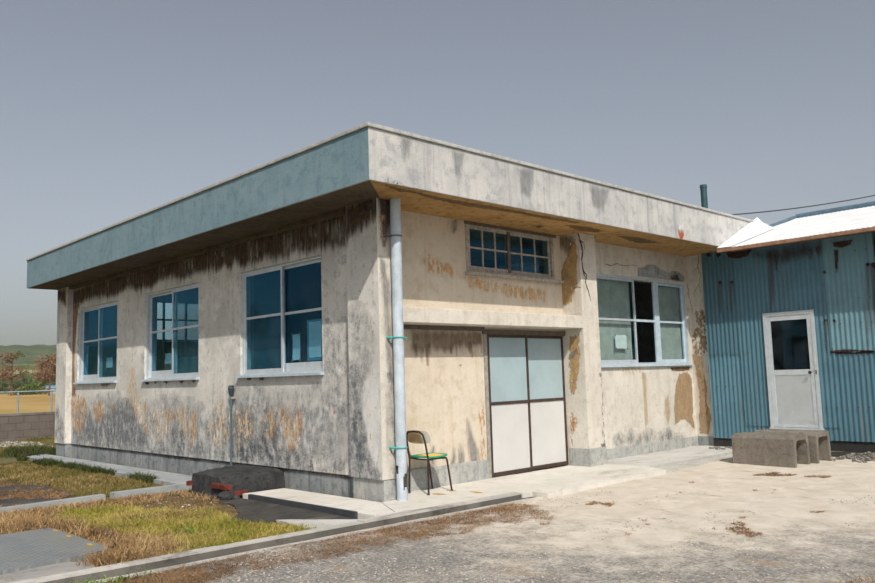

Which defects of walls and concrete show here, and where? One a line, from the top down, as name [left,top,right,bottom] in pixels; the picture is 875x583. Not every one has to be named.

damp [57,198,390,307]
spalling [560,237,578,305]
crack [576,233,591,300]
corrosion [707,250,752,259]
corrosion [823,240,852,274]
damp [381,260,392,380]
spalling [568,334,580,395]
spalling [671,309,711,434]
peeling [71,395,114,434]
peeling [128,368,196,447]
damp [56,397,369,479]
peeling [207,389,303,452]